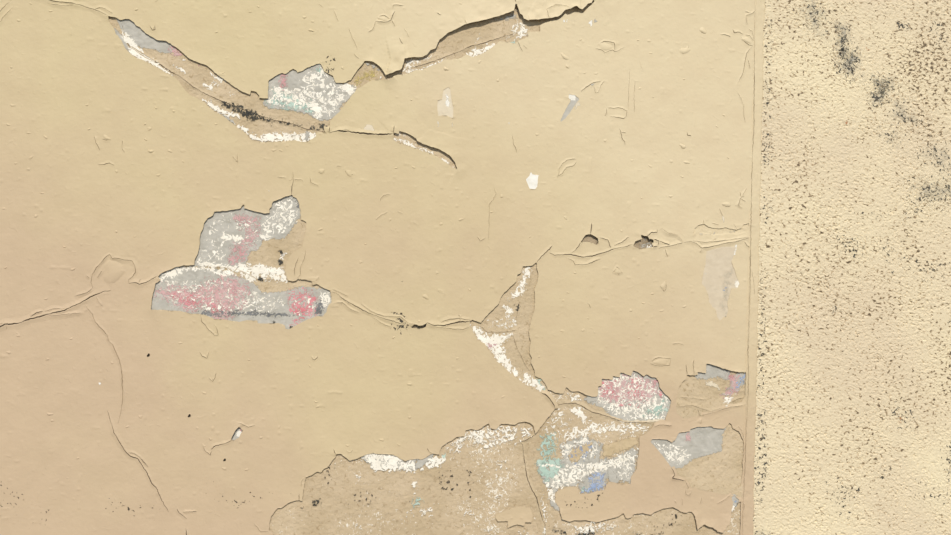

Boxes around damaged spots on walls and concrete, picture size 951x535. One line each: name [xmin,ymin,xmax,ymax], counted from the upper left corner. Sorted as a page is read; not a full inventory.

crack [0,0,399,140]
peeling [102,0,605,148]
peeling [364,123,463,175]
peeling [144,190,337,337]
crack [197,0,757,535]
spalling [628,228,658,255]
crack [0,252,197,535]
peeling [263,256,754,535]